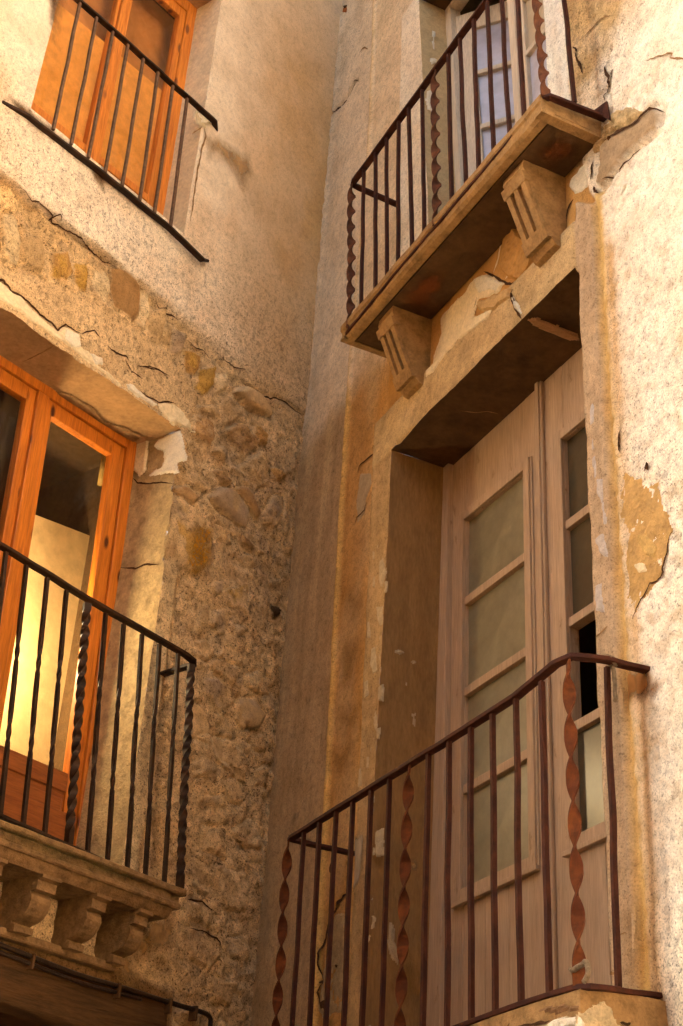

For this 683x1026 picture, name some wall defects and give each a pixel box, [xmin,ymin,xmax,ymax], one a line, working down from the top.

spalling [593,107,644,153]
flaking render [569,164,588,194]
flaking render [426,274,579,377]
peeling [592,439,608,557]
spalling [620,473,673,612]
peeling [595,583,605,613]
spalling [539,1001,621,1026]